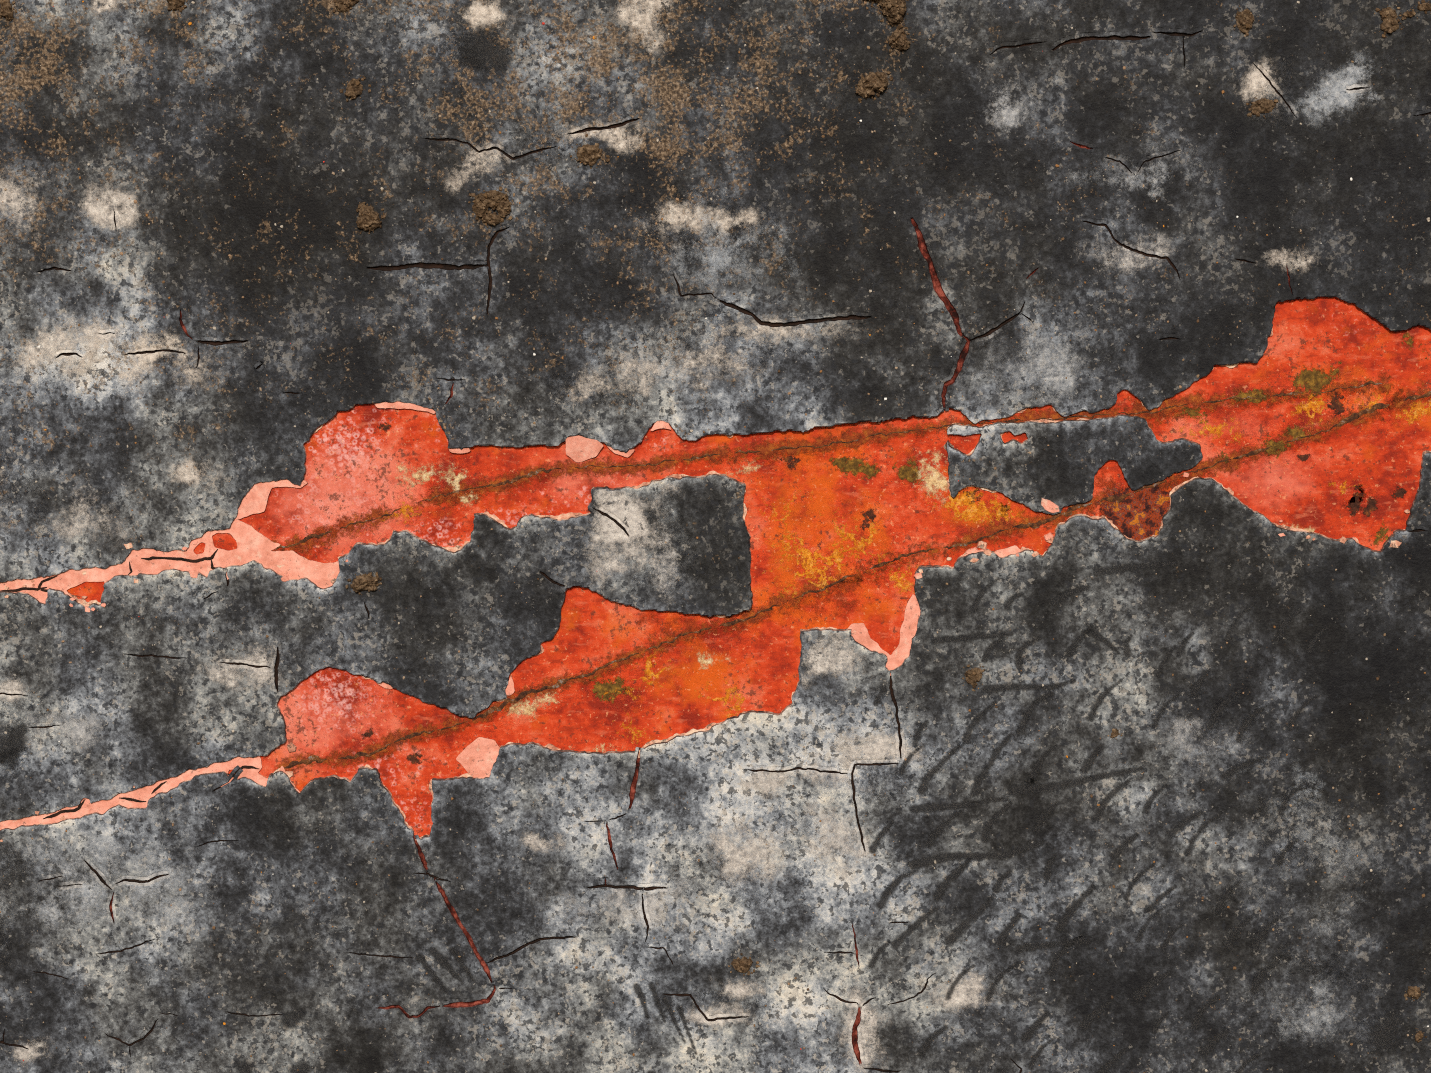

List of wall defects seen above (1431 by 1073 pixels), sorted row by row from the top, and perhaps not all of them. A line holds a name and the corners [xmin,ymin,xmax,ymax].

crack [422,115,641,163]
crack [366,224,512,318]
crack [670,271,873,331]
crack [908,215,1042,412]
crack [1081,217,1183,283]
peeling [0,296,1431,842]
crack [210,765,243,795]
crack [740,670,906,856]
crack [30,857,170,983]
crack [375,835,580,1022]
crack [582,747,751,1025]
crack [821,918,939,1073]